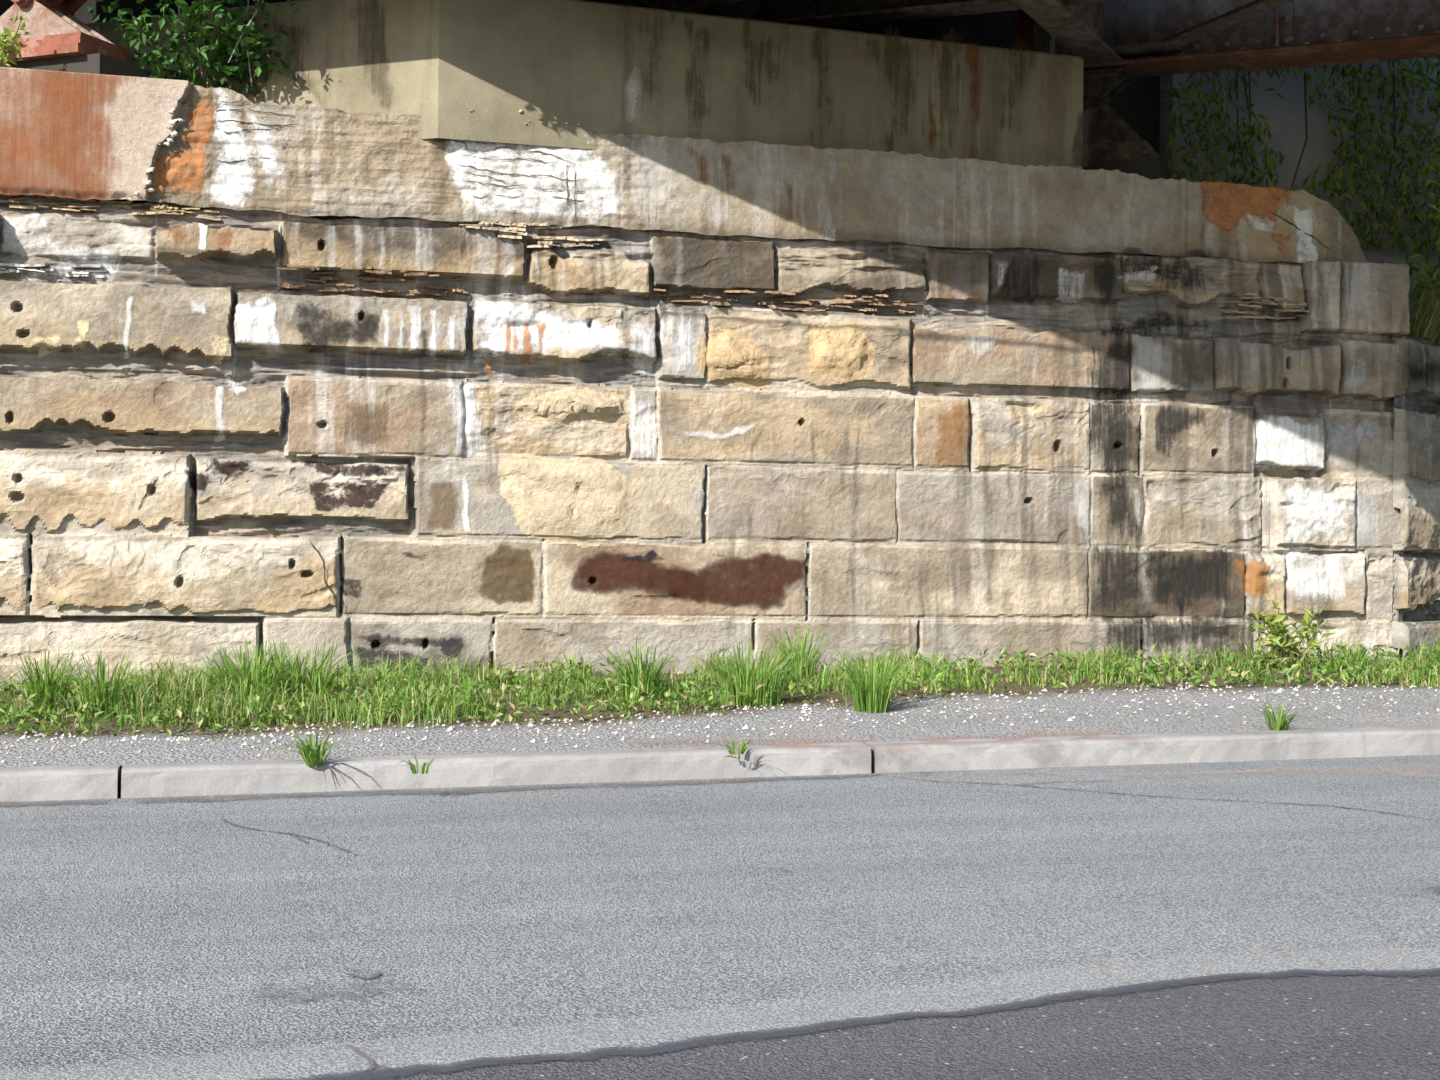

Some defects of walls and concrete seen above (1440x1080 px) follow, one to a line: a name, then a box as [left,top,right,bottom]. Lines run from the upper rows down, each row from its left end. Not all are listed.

corrosion [0,70,112,200]
corrosion [1201,181,1301,252]
leakage [998,249,1211,303]
leakage [34,321,89,357]
leakage [124,297,132,358]
leakage [212,298,283,364]
leakage [296,304,455,356]
leakage [473,301,657,374]
leakage [215,379,244,441]
leakage [452,383,485,456]
leakage [428,479,470,532]
leakage [1076,312,1228,659]